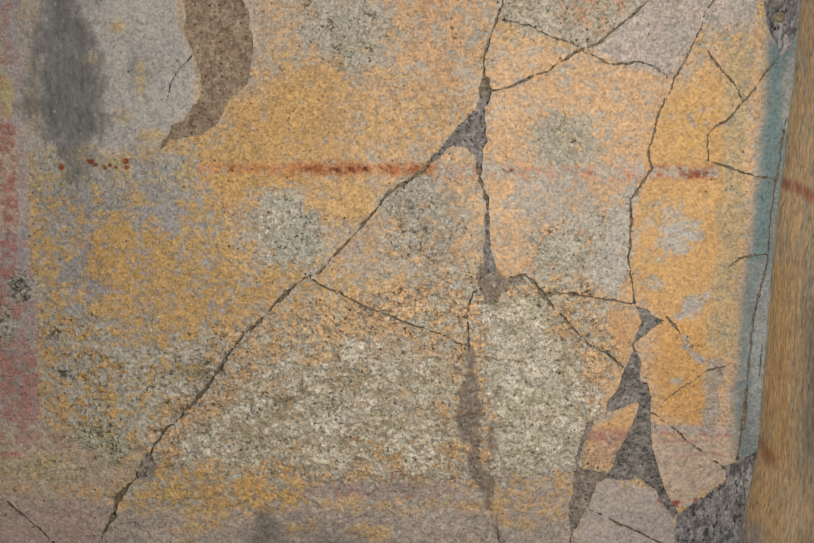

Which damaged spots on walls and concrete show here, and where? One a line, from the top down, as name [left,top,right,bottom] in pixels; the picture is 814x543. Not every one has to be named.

leakage [25,0,103,155]
spalling [160,0,253,149]
corrosion [86,158,129,170]
crack [150,154,482,454]
crack [476,164,489,210]
crack [479,0,786,469]
crack [102,471,139,538]
crack [589,509,662,543]